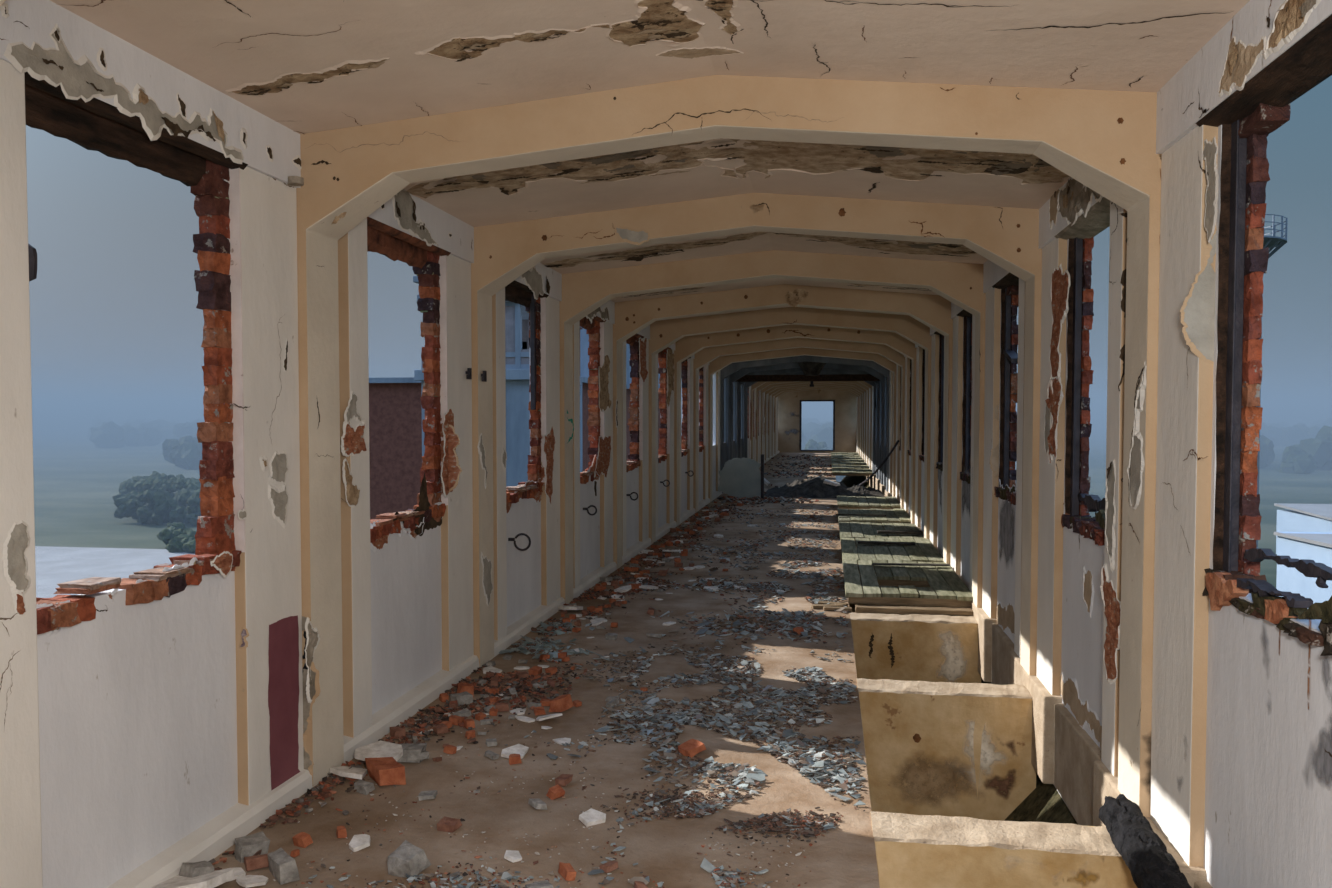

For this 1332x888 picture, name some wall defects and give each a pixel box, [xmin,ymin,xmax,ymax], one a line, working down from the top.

spalling [4,24,244,164]
crack [219,0,358,50]
spalling [224,57,390,96]
spalling [414,0,744,62]
spalling [1218,0,1321,97]
crack [588,108,844,181]
spalling [1180,137,1219,364]
flaking render [1044,264,1070,465]
spalling [2,520,70,617]
flaking render [1083,361,1147,685]
crack [0,613,20,727]
leakage [1312,726,1332,784]